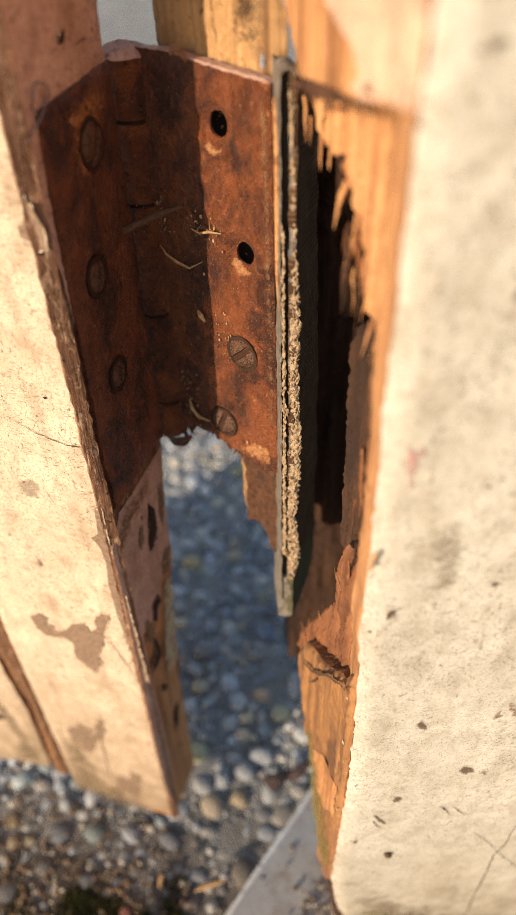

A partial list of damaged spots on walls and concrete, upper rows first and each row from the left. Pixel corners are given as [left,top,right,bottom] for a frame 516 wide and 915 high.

corrosion [63,85,107,178]
corrosion [232,256,251,276]
corrosion [168,435,192,446]
corrosion [242,443,270,464]
spalling [0,426,338,915]
crack [465,829,516,915]